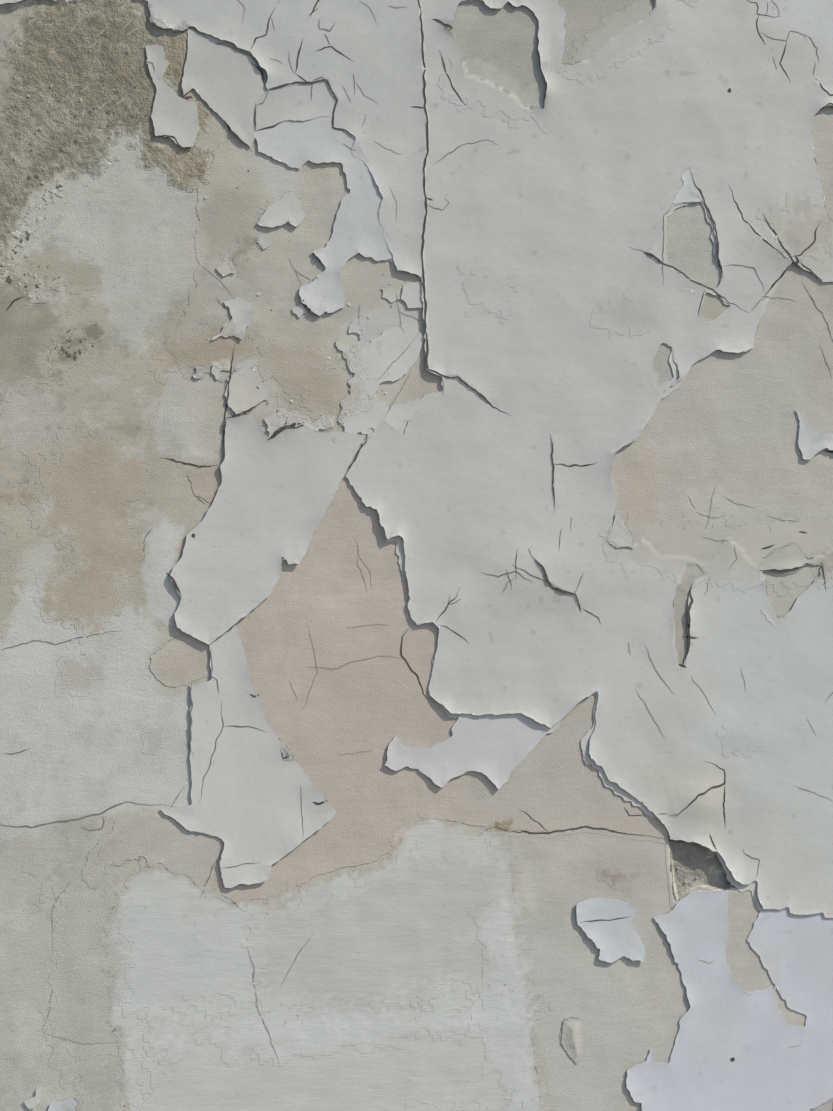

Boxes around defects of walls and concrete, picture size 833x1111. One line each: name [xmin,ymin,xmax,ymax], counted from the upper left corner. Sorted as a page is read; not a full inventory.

water stain [0,0,44,108]
crack [225,0,398,154]
water stain [0,169,77,402]
crack [348,0,507,471]
peeling [666,170,729,321]
crack [629,168,833,378]
water stain [0,418,154,663]
peeling [0,0,675,903]
crack [482,433,601,624]
peeling [599,262,833,665]
crack [628,490,826,737]
peeling [509,832,806,1111]